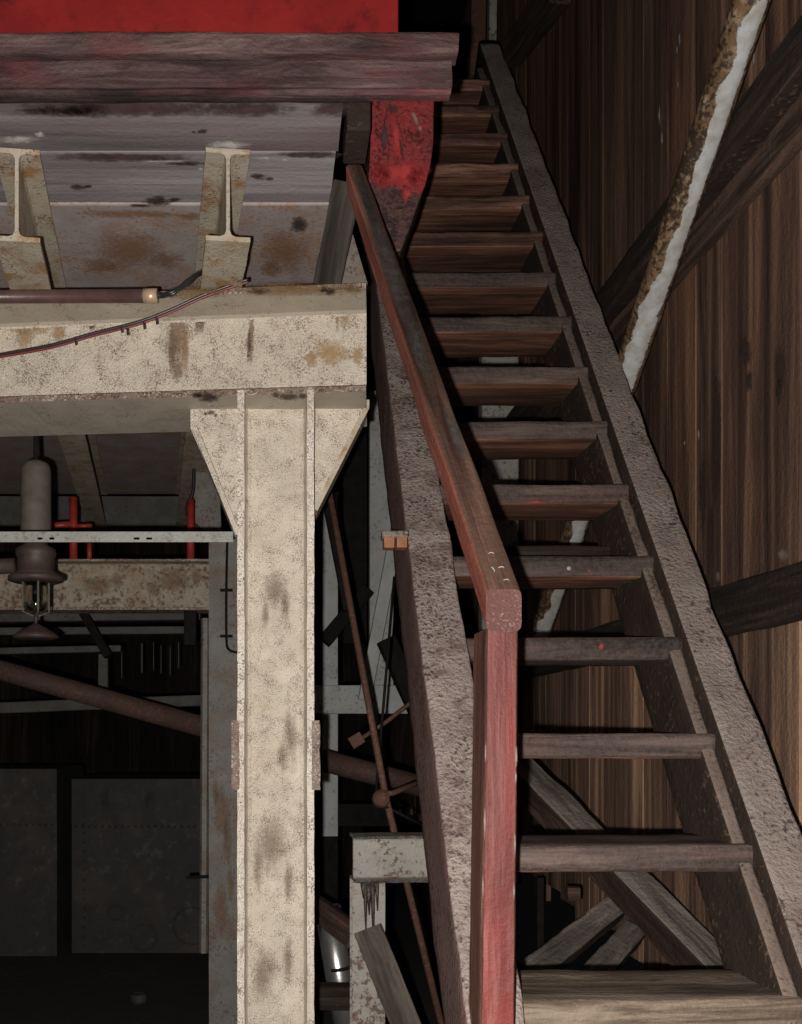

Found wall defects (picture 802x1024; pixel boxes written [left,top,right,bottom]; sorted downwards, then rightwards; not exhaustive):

damp [35,106,103,116]
damp [205,103,278,116]
damp [71,154,204,166]
damp [132,196,179,207]
corrosion [169,322,204,377]
corrosion [306,343,361,364]